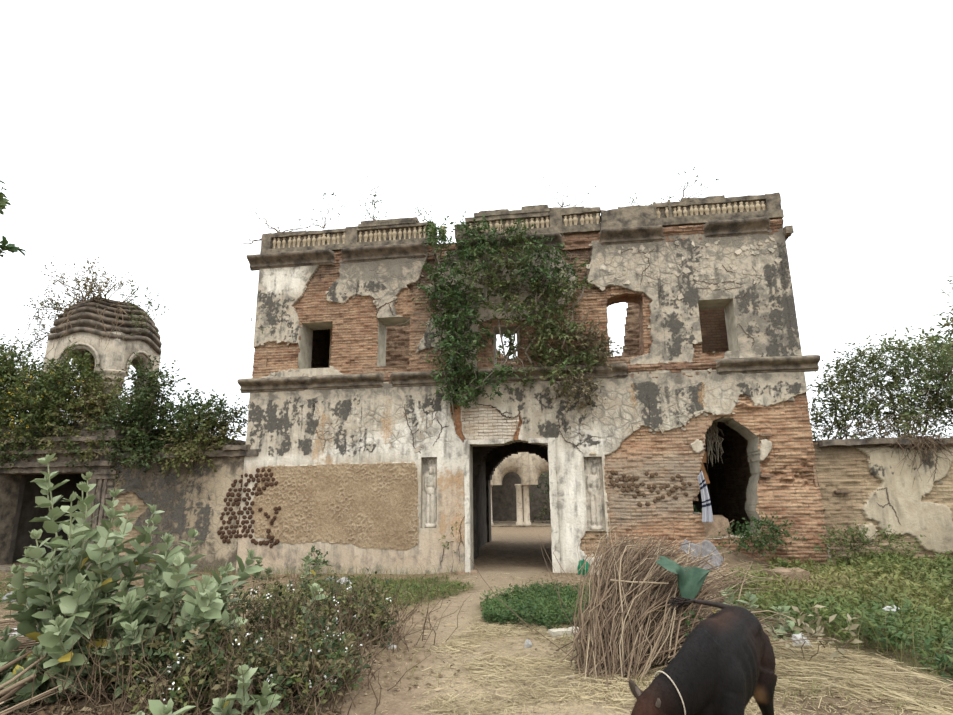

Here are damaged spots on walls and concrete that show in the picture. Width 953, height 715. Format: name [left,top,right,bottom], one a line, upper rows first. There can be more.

spalling [252,253,449,378]
spalling [476,236,782,372]
damp [656,237,703,360]
damp [735,243,801,357]
damp [248,397,376,456]
damp [406,393,443,426]
spalling [461,406,522,440]
damp [631,381,704,429]
spalling [580,392,830,574]
damp [737,381,801,402]